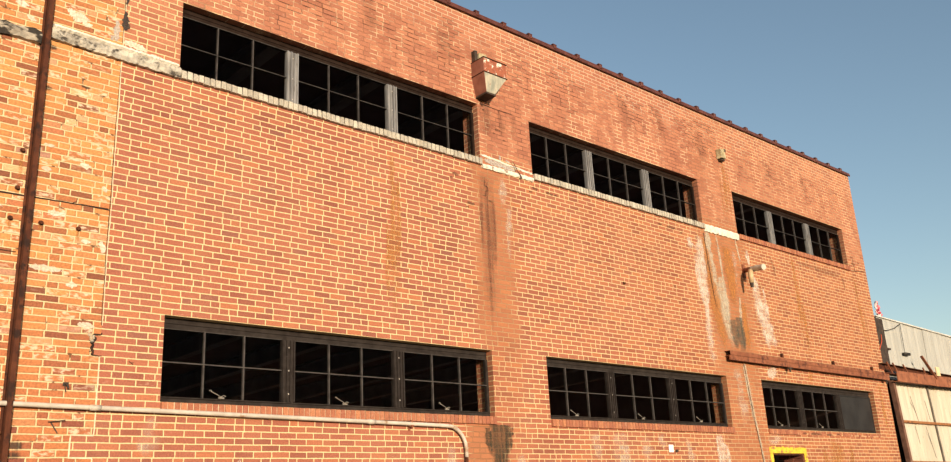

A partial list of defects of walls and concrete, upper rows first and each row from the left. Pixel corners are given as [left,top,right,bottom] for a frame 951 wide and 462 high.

peeling [111,21,163,59]
corrosion [703,241,724,337]
water stain [688,239,746,346]
water stain [754,278,775,342]
water stain [486,427,513,462]